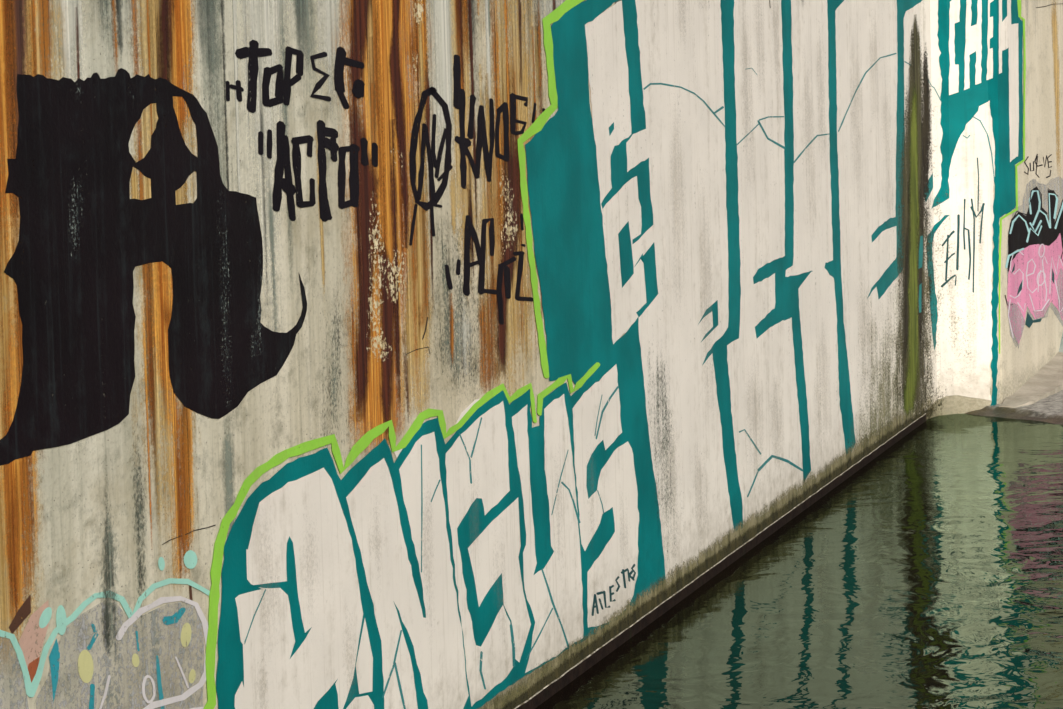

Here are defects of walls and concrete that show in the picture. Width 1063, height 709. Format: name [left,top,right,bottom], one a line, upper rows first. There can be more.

corrosion [0,0,63,440]
damp [55,0,83,94]
damp [103,0,140,49]
corrosion [131,103,158,200]
corrosion [132,0,195,155]
corrosion [139,262,194,578]
damp [203,0,342,353]
corrosion [340,0,433,447]
damp [428,0,455,151]
damp [429,221,480,388]
corrosion [450,0,542,394]
damp [484,43,942,709]